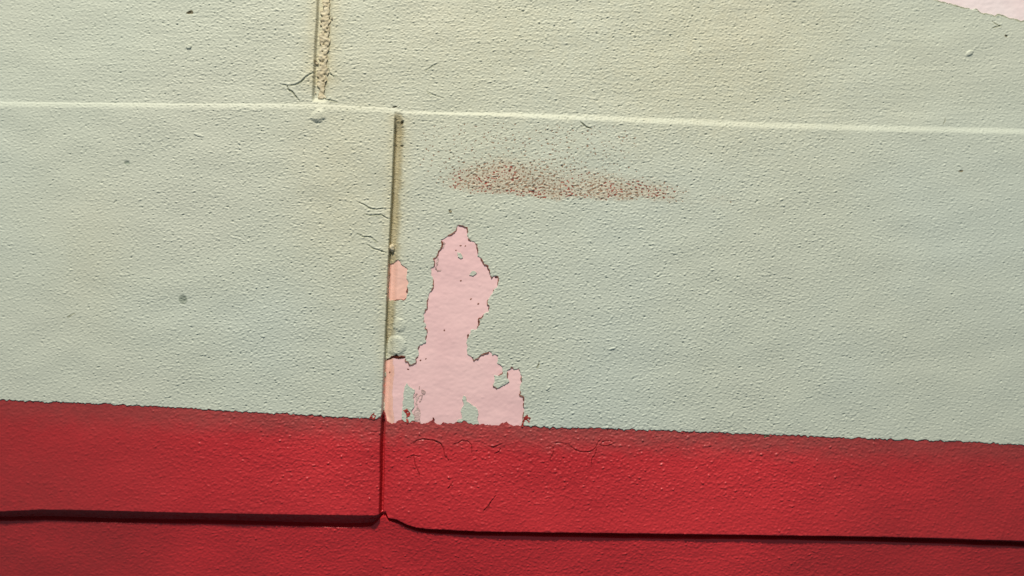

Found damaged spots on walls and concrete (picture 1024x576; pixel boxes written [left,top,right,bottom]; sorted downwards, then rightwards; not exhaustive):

peeling [382,225,524,426]